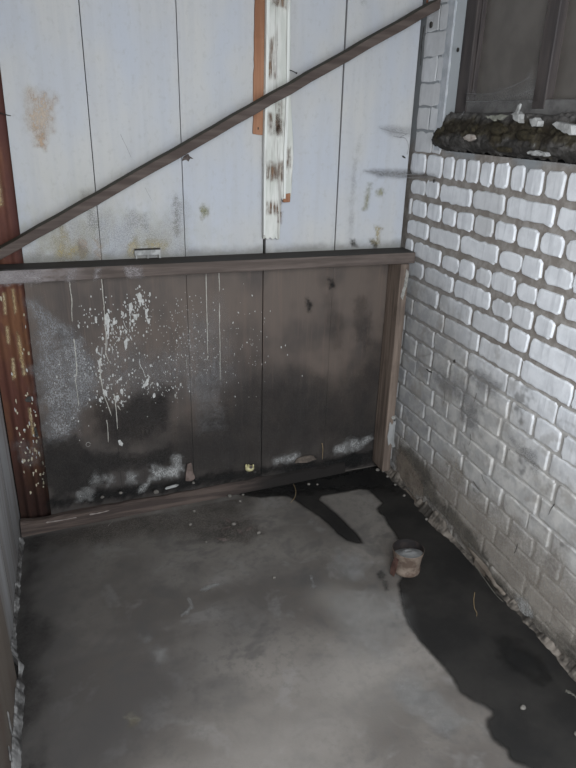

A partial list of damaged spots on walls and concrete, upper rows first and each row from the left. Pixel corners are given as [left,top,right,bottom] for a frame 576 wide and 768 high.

leakage [28,302,576,768]